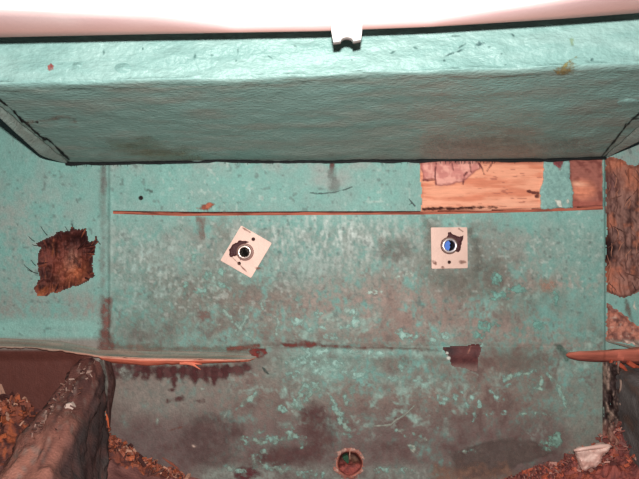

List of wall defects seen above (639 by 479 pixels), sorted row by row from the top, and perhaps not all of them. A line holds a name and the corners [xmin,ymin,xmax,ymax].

peeling [420,157,639,309]
spalling [443,320,501,371]
spalling [606,303,639,347]
leakage [261,406,331,466]